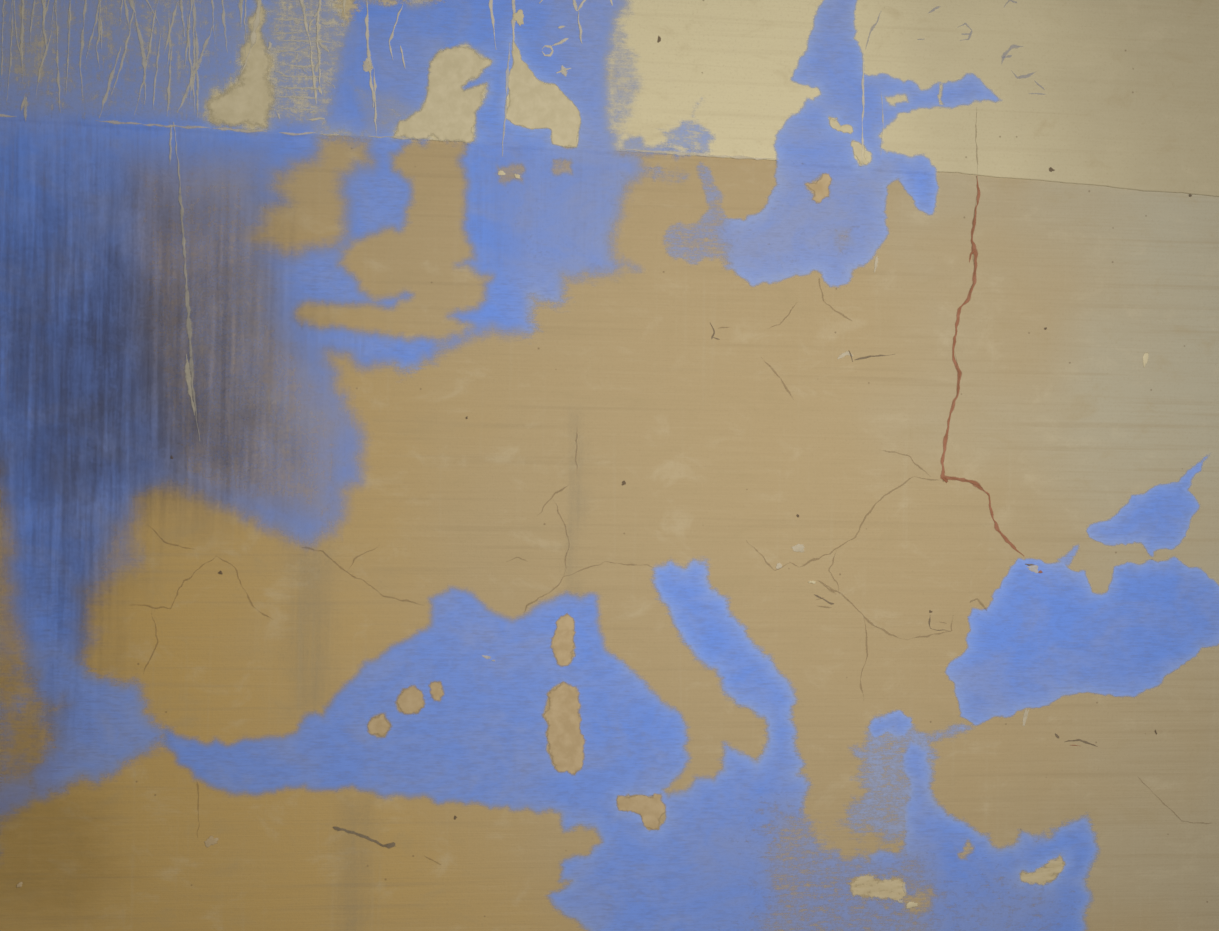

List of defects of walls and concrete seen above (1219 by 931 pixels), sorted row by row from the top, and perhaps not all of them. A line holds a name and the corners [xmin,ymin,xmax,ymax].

leakage [169,122,200,441]
peeling [0,0,773,815]
peeling [665,0,999,287]
crack [941,176,1024,556]